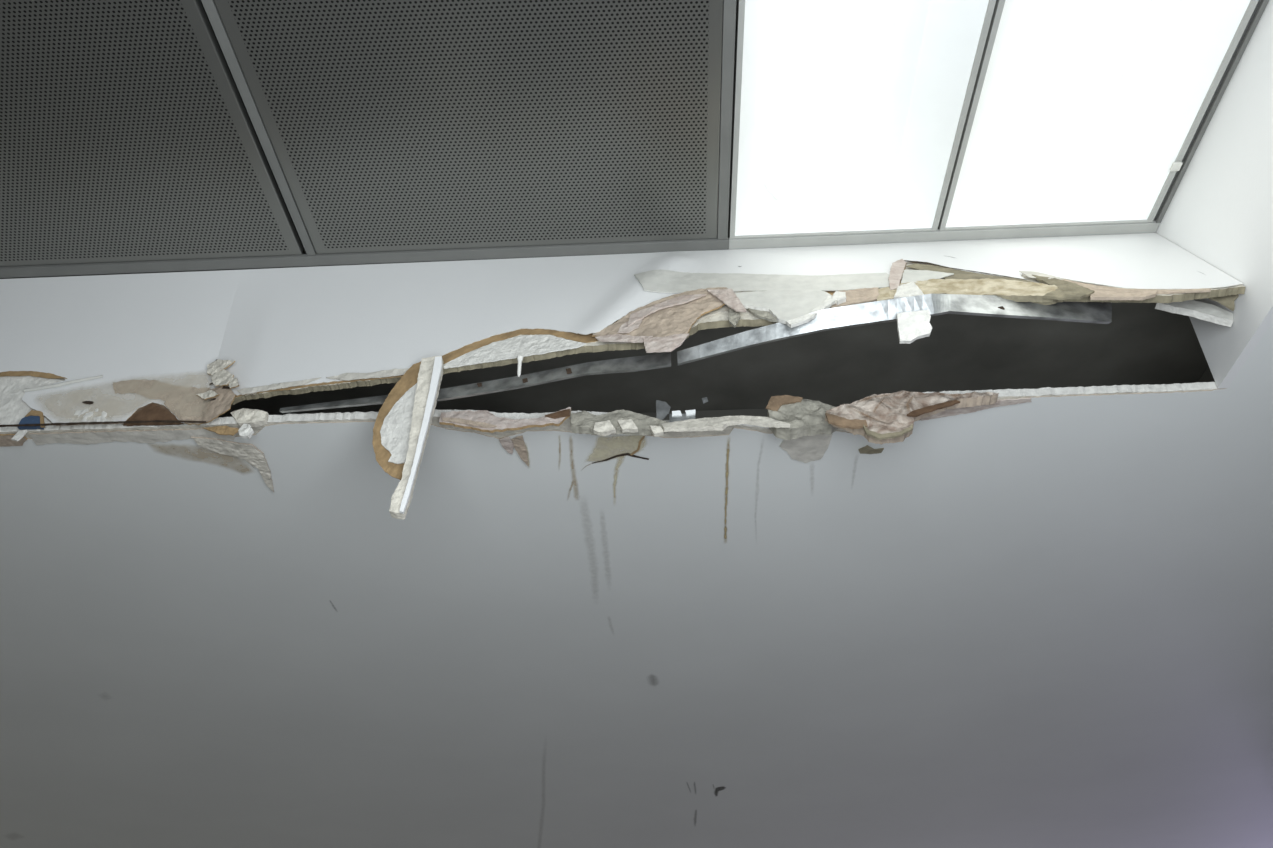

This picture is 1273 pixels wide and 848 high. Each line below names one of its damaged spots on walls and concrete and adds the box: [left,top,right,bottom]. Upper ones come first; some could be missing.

flaking render [634,263,1211,344]
flaking render [0,371,274,492]
spalling [662,415,833,463]
peeling [858,445,884,454]